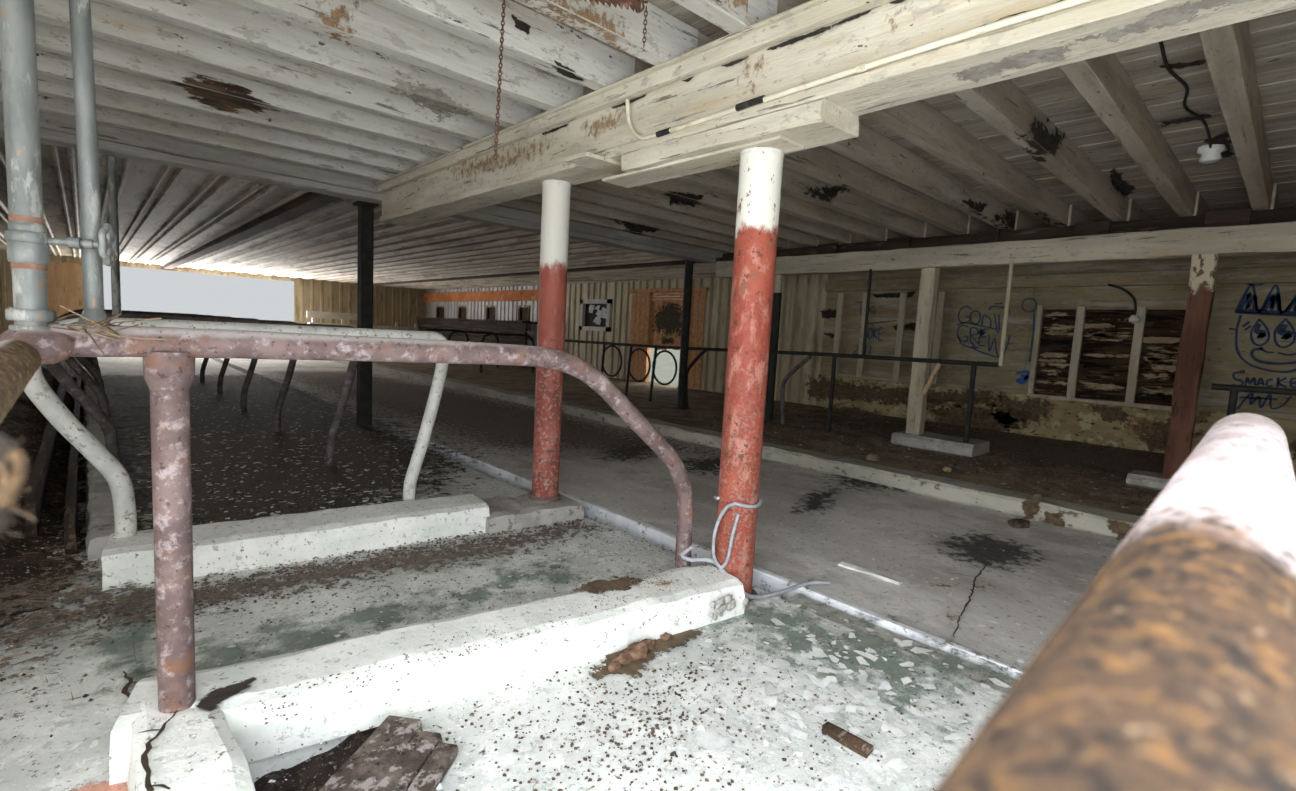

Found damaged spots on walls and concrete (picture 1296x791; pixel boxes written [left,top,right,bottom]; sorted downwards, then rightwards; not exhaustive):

water stain [931,529,1048,572]
crack [946,556,996,638]
crack [138,711,177,791]